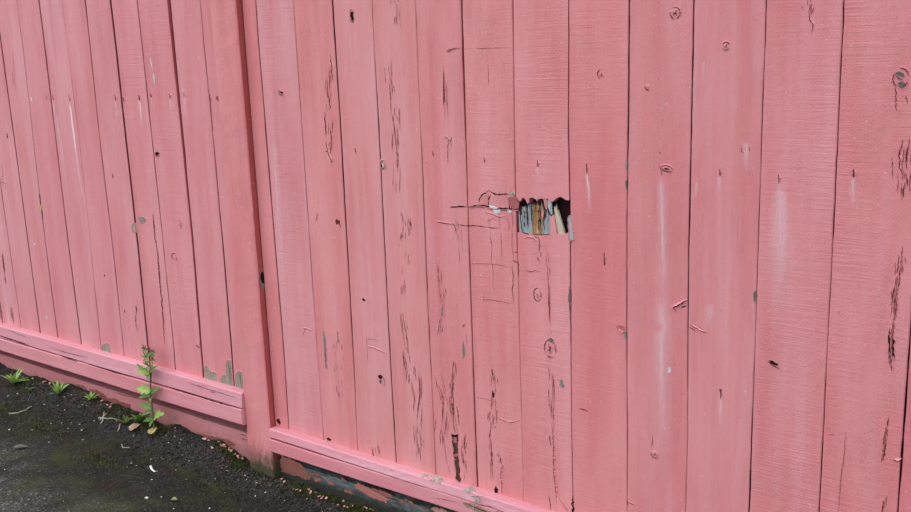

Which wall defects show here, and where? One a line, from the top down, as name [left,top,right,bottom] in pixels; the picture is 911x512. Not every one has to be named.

crack [802,0,815,33]
crack [324,55,334,163]
crack [381,65,401,190]
crack [444,136,452,163]
crack [443,48,485,114]
crack [892,138,911,197]
spalling [476,191,575,242]
crack [888,247,906,373]
peeling [204,359,243,389]
crack [366,212,571,509]
peeling [279,455,393,503]
peeling [463,502,502,512]